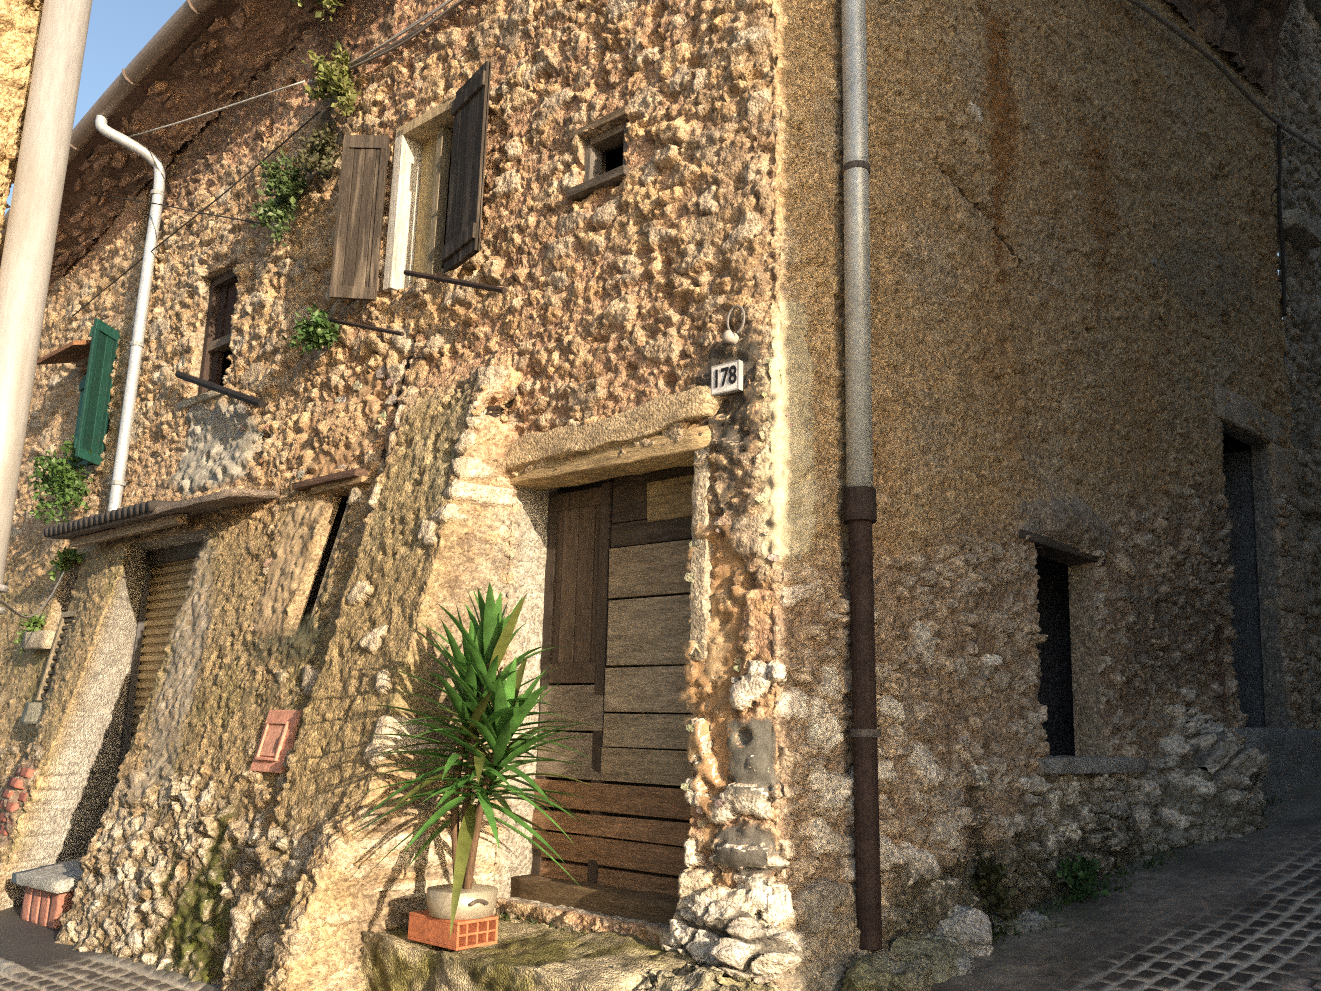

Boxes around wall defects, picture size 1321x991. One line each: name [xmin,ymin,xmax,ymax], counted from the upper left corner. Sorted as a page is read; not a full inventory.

corrosion [983,1,1018,281]